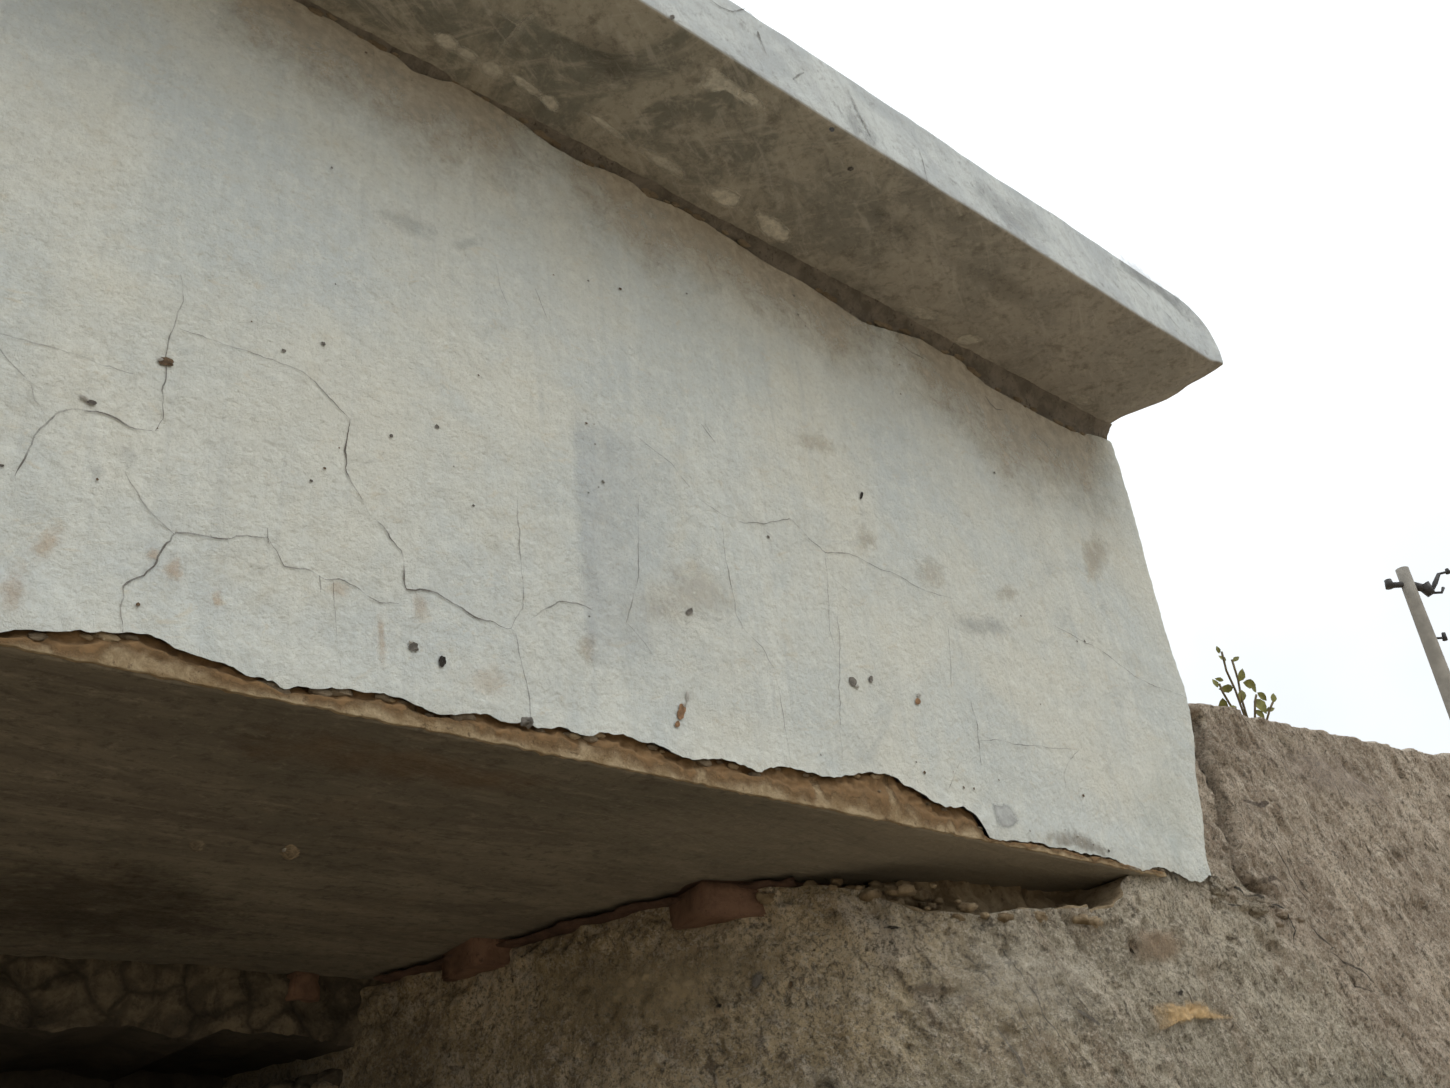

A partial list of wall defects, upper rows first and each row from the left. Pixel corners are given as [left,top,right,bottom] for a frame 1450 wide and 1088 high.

crack [87,333,171,431]
crack [316,383,350,477]
crack [120,532,297,633]
crack [336,532,519,649]
spalling [0,630,1167,928]